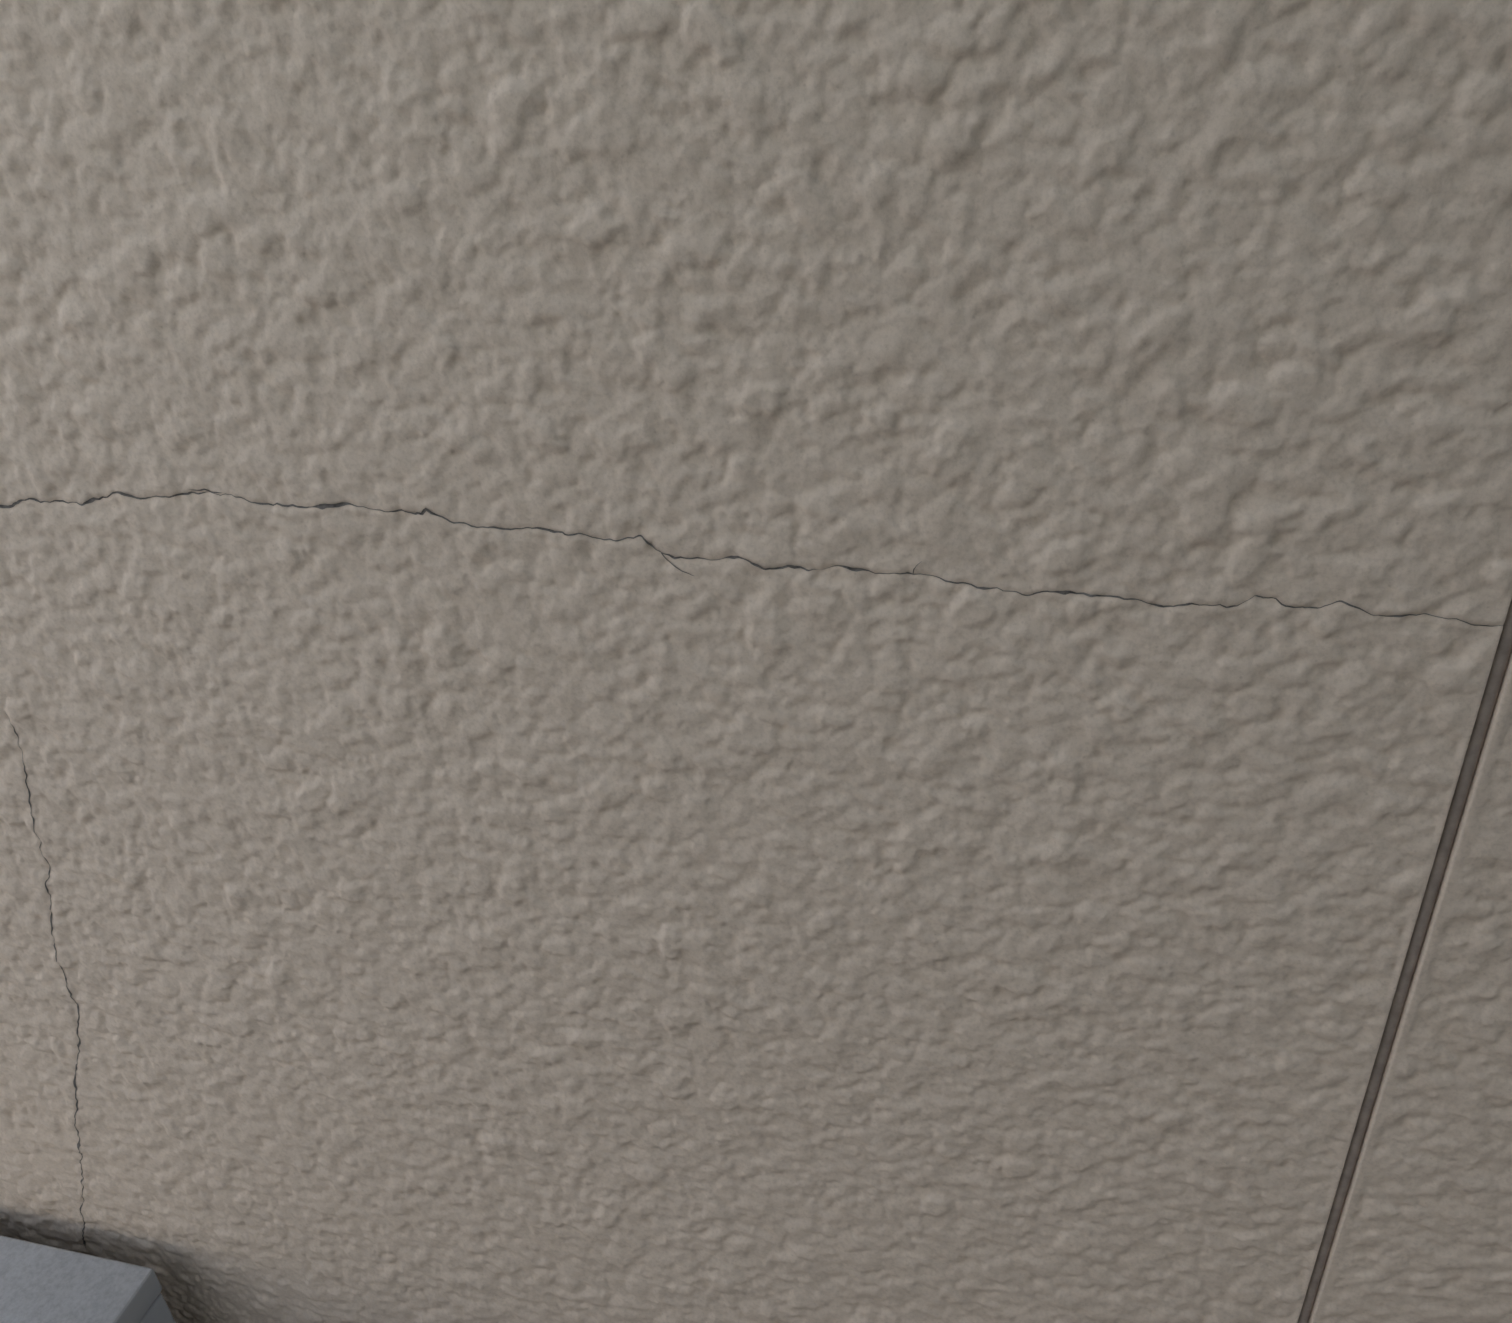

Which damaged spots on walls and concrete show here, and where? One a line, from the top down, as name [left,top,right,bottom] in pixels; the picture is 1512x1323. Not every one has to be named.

crack [0,489,1505,627]
crack [4,706,86,1248]